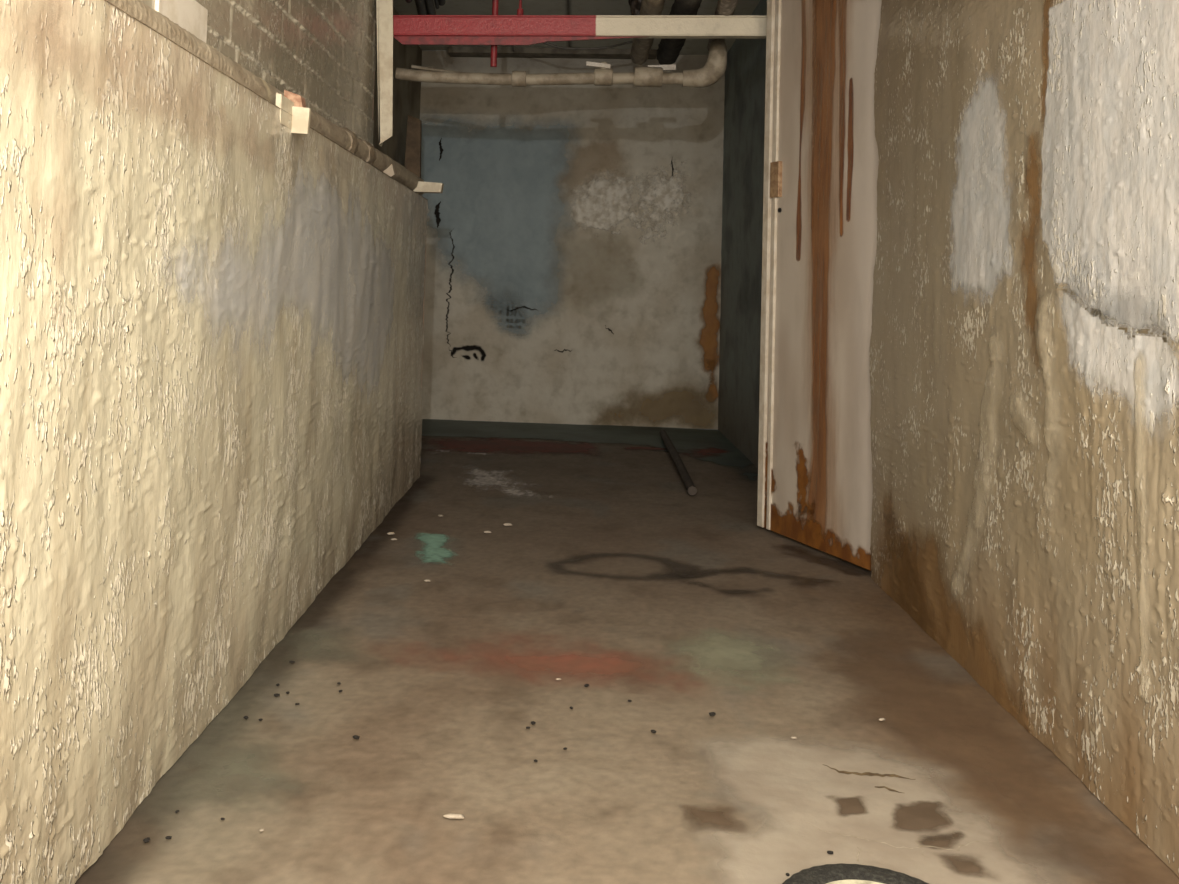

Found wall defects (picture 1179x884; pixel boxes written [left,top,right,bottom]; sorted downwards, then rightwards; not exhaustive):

water stain [599,388,718,429]
rust [699,266,720,403]
rust [764,0,1033,735]